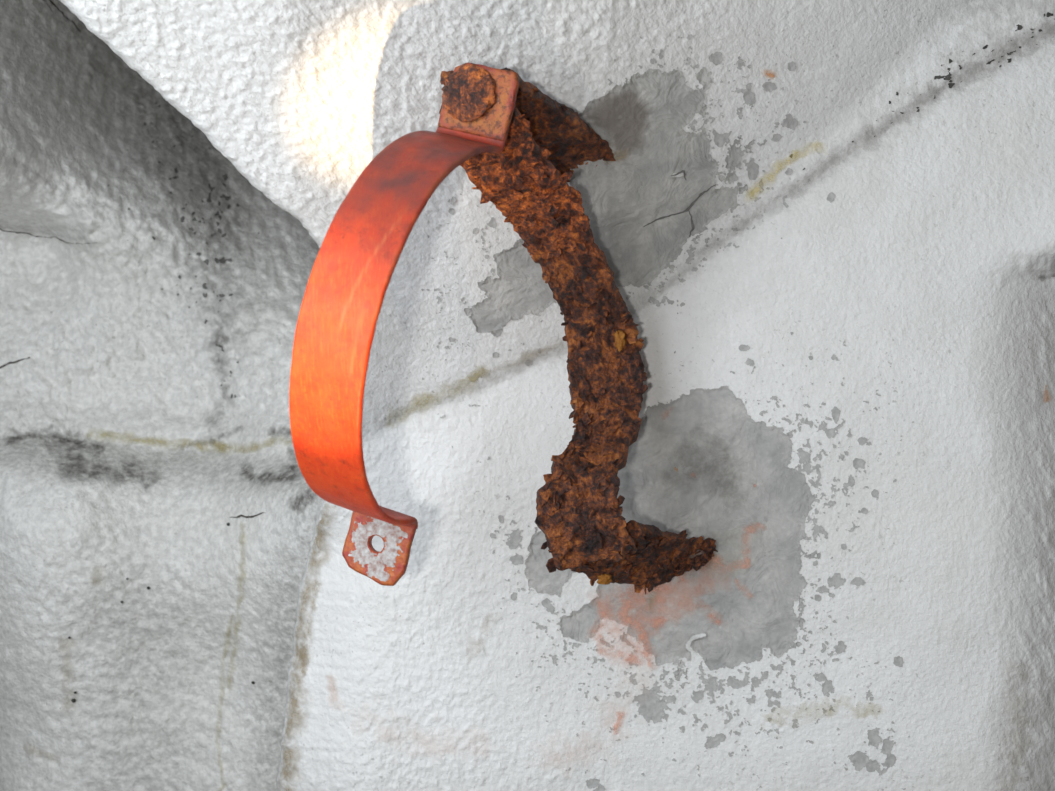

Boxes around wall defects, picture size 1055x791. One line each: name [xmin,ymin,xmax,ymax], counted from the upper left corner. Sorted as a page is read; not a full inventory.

crack [44,0,81,32]
water stain [934,59,962,88]
water stain [962,24,1042,67]
crack [0,229,98,244]
water stain [180,174,239,265]
crack [643,170,716,237]
peeling [570,35,806,314]
peeling [421,217,557,361]
water stain [244,465,295,481]
peeling [490,377,914,761]
peeling [585,770,605,791]
peeling [834,721,913,790]